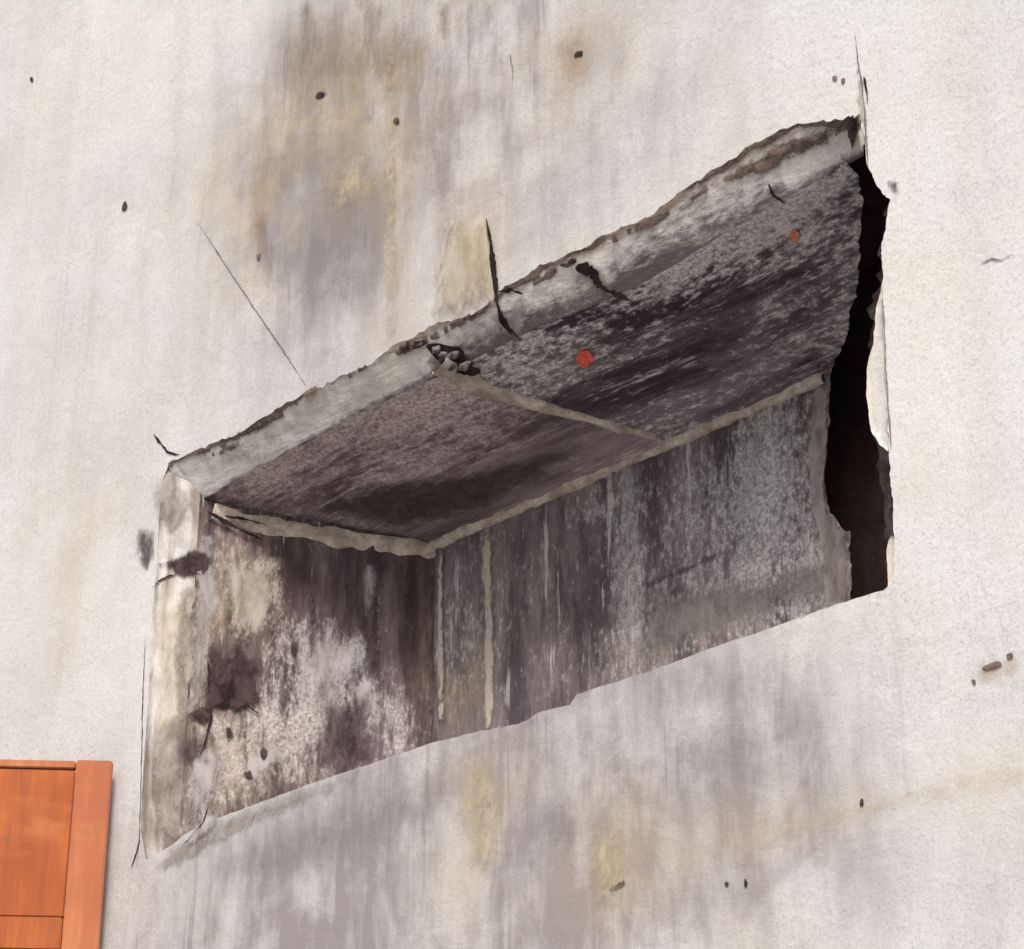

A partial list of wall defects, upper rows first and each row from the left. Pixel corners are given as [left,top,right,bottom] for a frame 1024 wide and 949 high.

spalling [687,115,859,202]
crack [198,223,306,386]
crack [486,219,524,340]
spalling [395,209,670,376]
spalling [866,281,889,451]
peeling [152,386,317,528]
peeling [153,536,328,865]
peeling [290,629,377,768]
water stain [482,536,493,728]